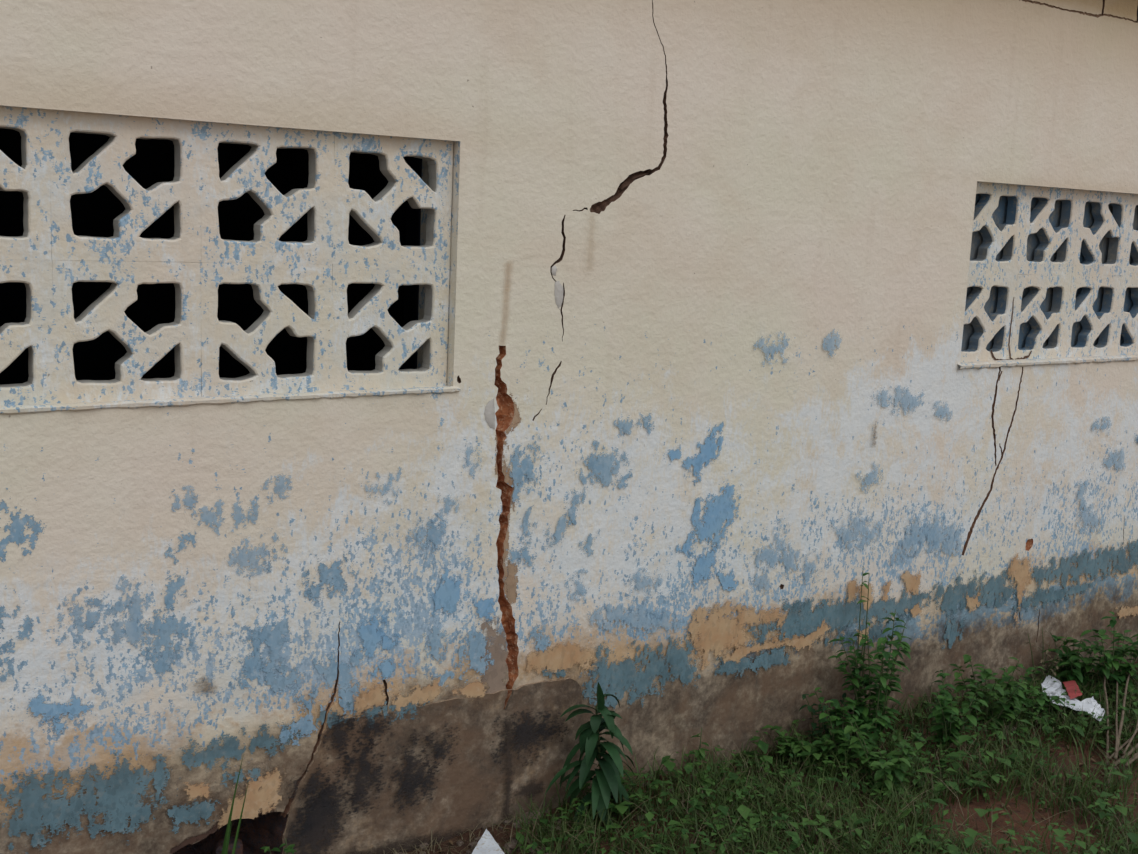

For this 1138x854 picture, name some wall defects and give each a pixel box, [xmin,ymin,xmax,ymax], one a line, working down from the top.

crack [1019,0,1138,23]
peeling [0,488,45,562]
peeling [57,474,294,677]
crack [481,0,669,709]
peeling [506,413,655,567]
peeling [525,477,1138,709]
crack [962,299,1032,556]
peeling [0,568,496,854]
crack [281,622,340,817]
water stain [287,708,476,854]
crack [381,680,389,712]
water stain [490,710,573,820]